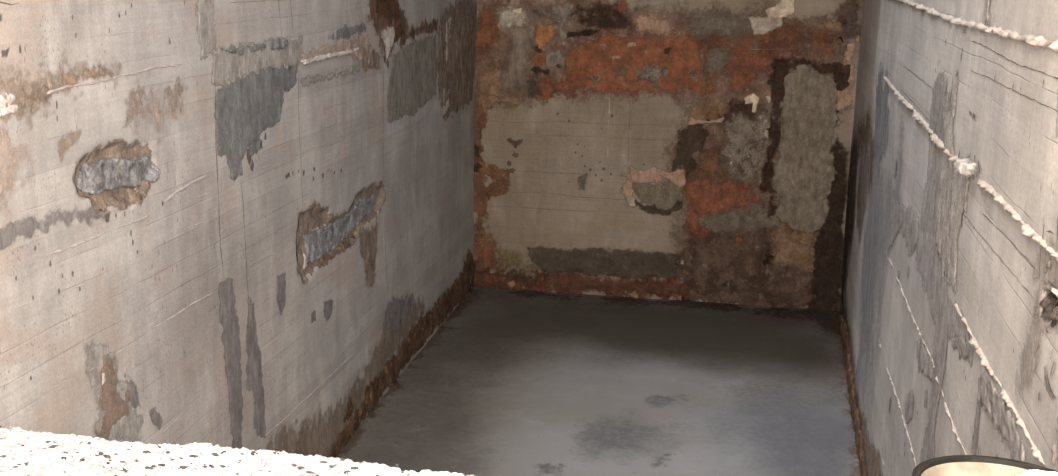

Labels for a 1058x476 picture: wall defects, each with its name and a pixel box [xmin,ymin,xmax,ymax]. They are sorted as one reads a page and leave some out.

flaking render [527,8,775,103]
peeling [247,132,266,171]
damp [427,62,901,378]
flaking render [682,146,759,243]
hole [1034,258,1058,333]
damp [358,390,468,467]